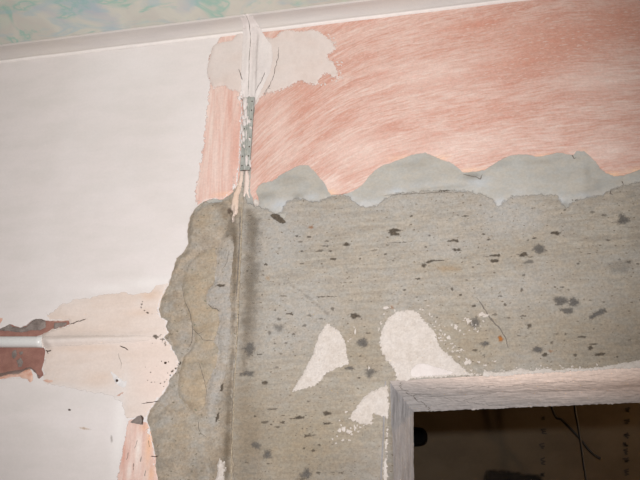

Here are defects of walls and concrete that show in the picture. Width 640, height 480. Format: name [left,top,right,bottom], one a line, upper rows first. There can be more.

spalling [271,213,286,224]
spalling [0,318,70,336]
spalling [117,171,260,480]
flaking render [419,305,489,372]
crack [477,298,508,347]
spalling [0,348,53,383]